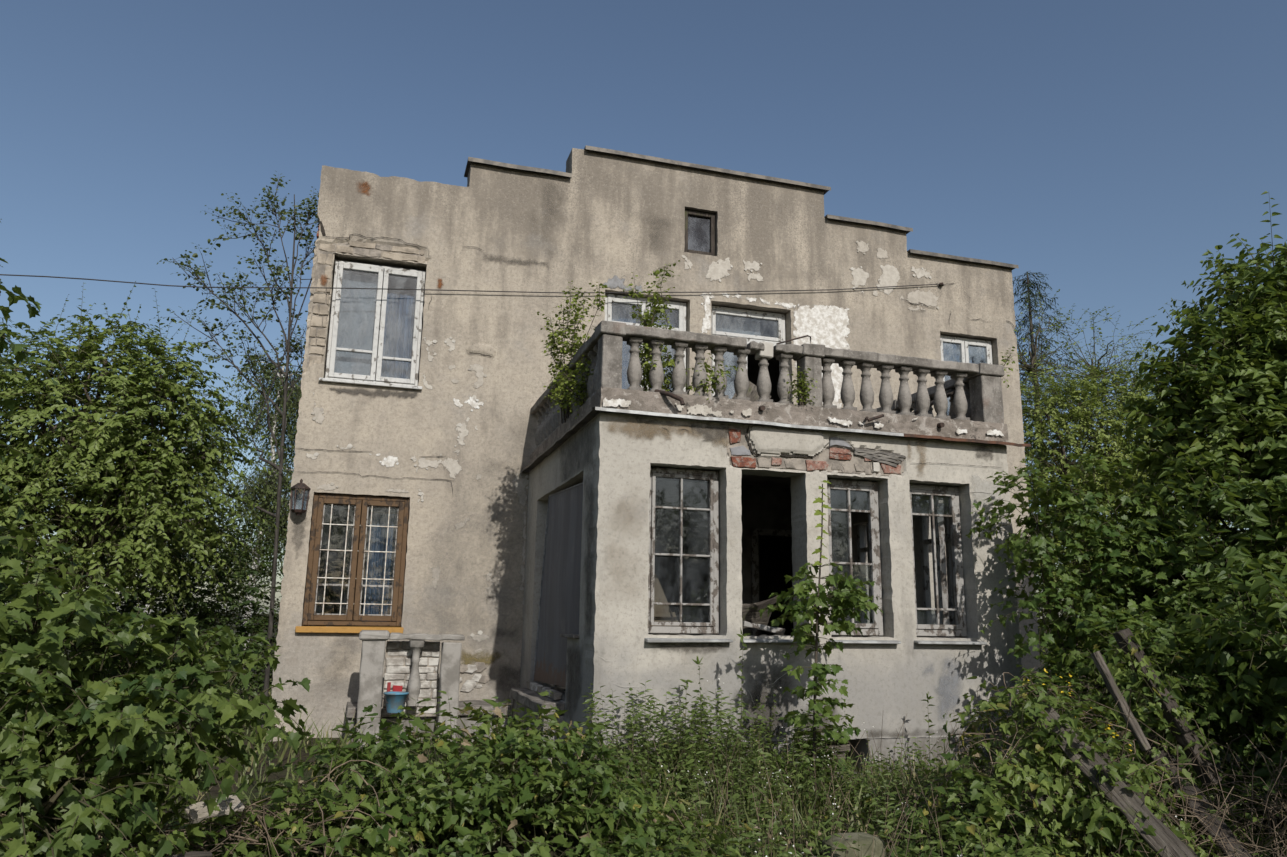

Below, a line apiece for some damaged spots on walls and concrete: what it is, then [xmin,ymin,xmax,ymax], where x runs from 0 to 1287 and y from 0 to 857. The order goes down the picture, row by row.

peeling [850,240,939,312]
peeling [370,337,487,479]
flaking render [675,255,906,476]
flaking render [459,630,490,692]